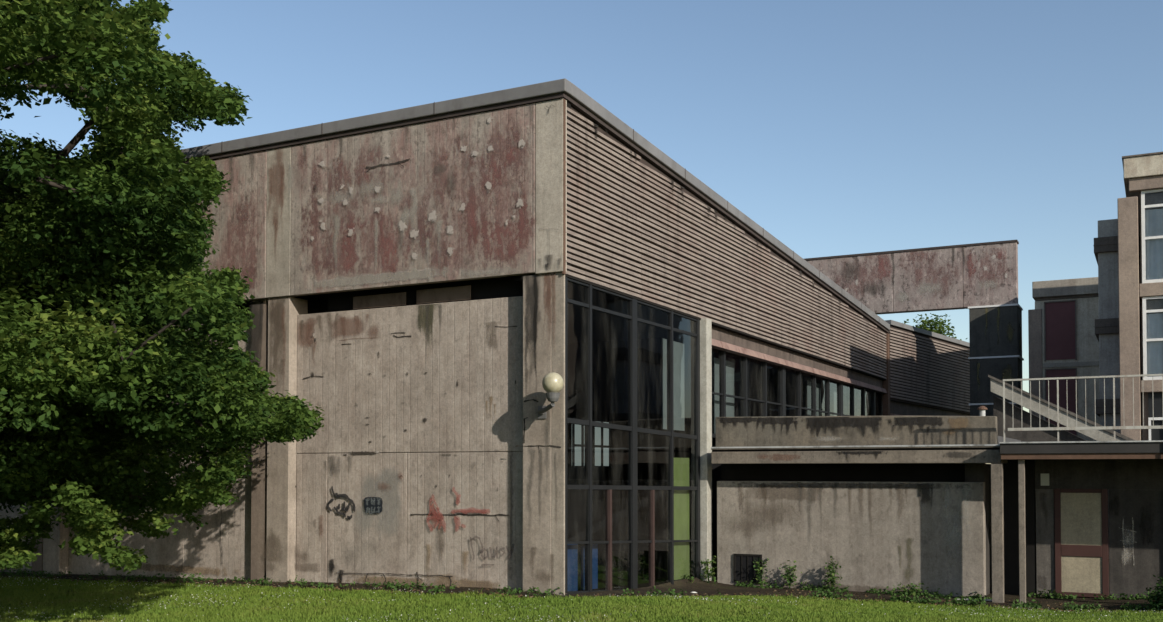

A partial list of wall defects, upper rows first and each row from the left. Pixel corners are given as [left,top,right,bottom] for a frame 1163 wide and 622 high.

peeling [302,116,529,275]
damp [717,417,943,457]
damp [757,482,949,502]